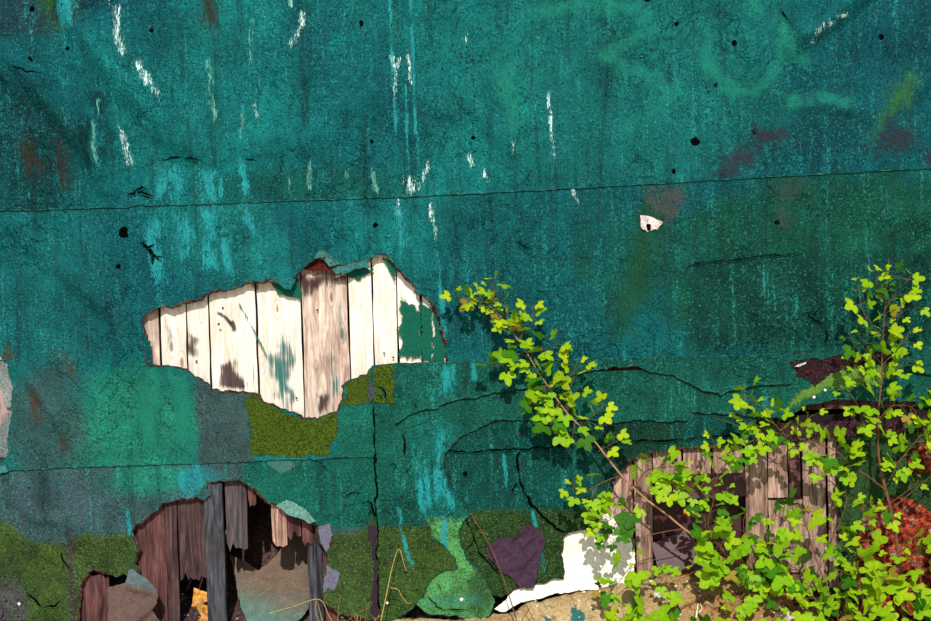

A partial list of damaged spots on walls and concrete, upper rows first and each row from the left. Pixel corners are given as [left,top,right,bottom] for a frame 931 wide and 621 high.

water stain [78,92,113,165]
peeling [640,215,663,232]
peeling [277,277,296,290]
peeling [304,250,374,281]
peeling [383,257,396,281]
peeling [245,298,446,474]
water stain [178,464,206,494]
peeling [277,500,333,552]
crack [344,385,406,614]
peeling [389,418,530,621]
crack [447,433,742,535]
peeling [323,565,340,593]